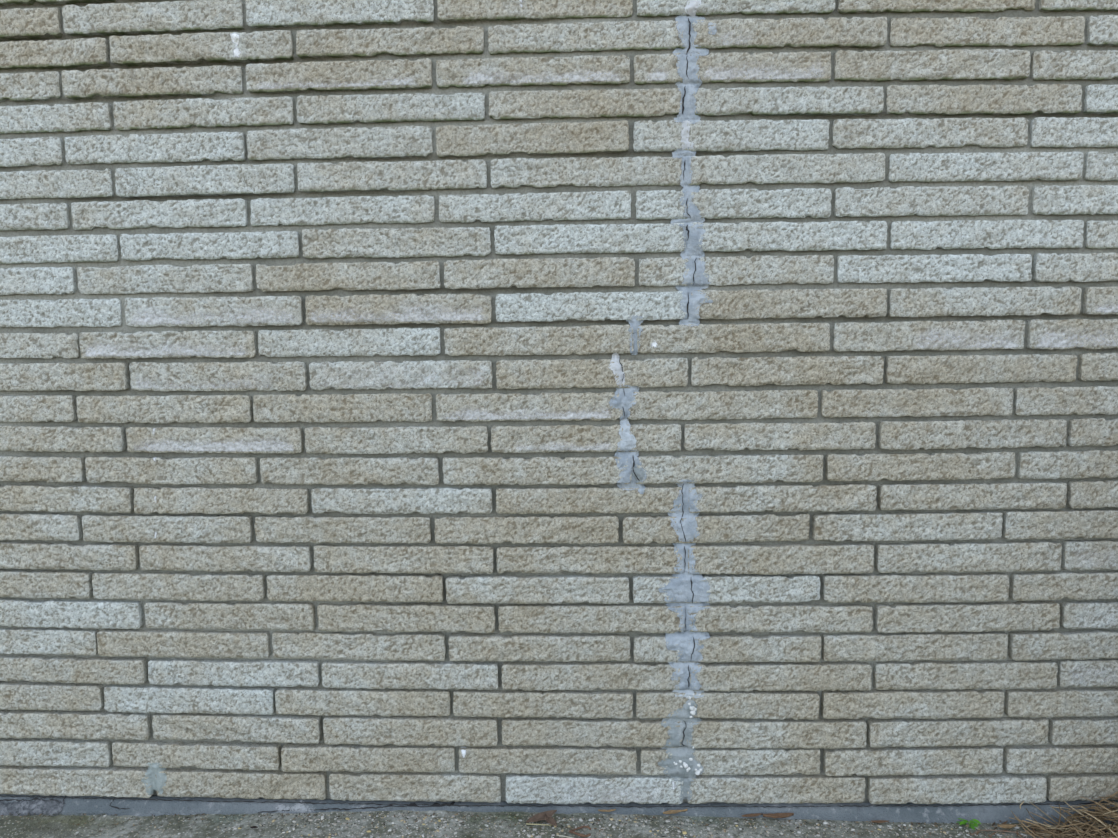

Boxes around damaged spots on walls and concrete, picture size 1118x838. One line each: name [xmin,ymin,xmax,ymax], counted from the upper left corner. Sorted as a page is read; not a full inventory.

crack [670,0,717,327]
crack [608,315,647,494]
crack [658,479,711,803]